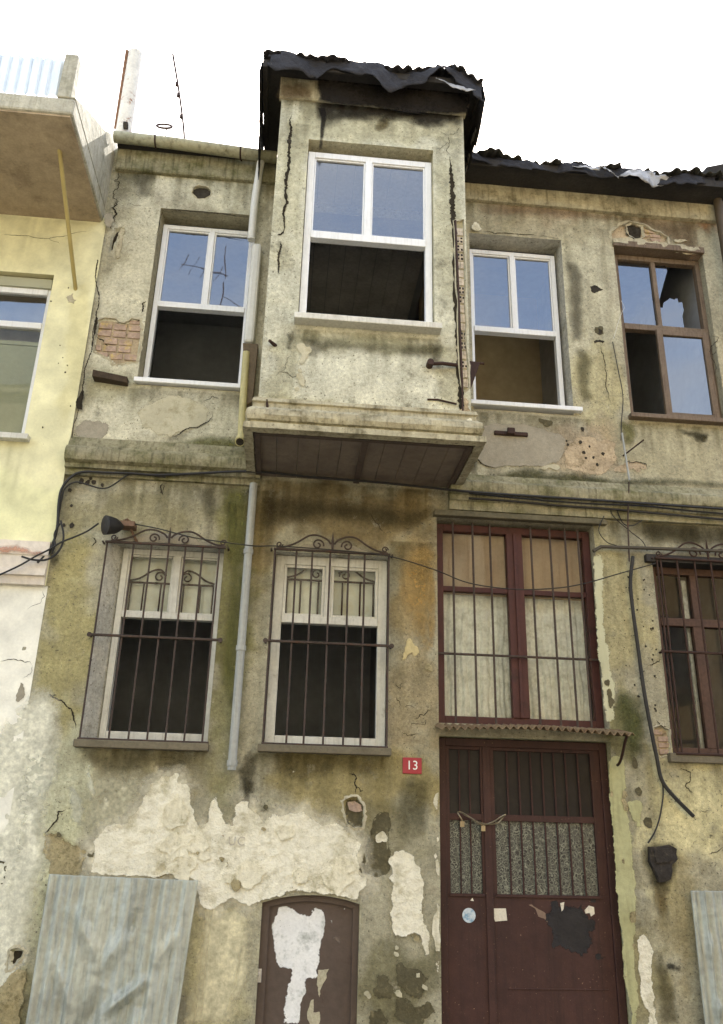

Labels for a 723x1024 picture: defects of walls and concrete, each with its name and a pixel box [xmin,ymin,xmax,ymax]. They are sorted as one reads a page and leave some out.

spalling [91,315,144,367]
crack [4,172,245,437]
crack [277,118,292,273]
crack [438,128,464,410]
spalling [608,220,700,255]
spalling [542,427,647,475]
crack [48,694,77,731]
leakage [241,757,254,800]
peeling [593,554,615,722]
peeling [43,770,441,1024]
peeling [608,755,658,1024]